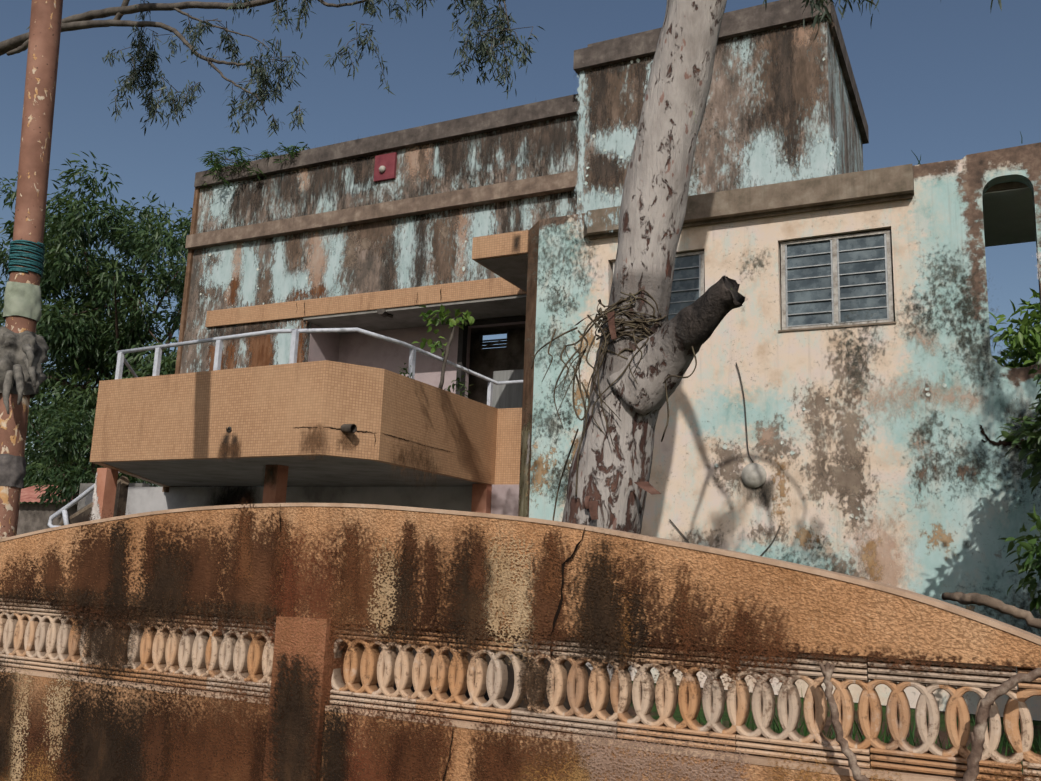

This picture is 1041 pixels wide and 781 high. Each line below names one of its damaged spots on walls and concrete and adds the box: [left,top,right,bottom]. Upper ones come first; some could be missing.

damp [204,154,376,232]
damp [398,214,430,287]
peeling [873,382,978,445]
peeling [518,420,579,517]
peeling [714,387,902,587]
peeling [682,529,723,548]
peeling [920,522,968,558]
damp [0,493,355,781]
crack [550,528,585,658]
damp [326,520,1041,691]
crack [442,730,453,781]
damp [466,717,750,781]